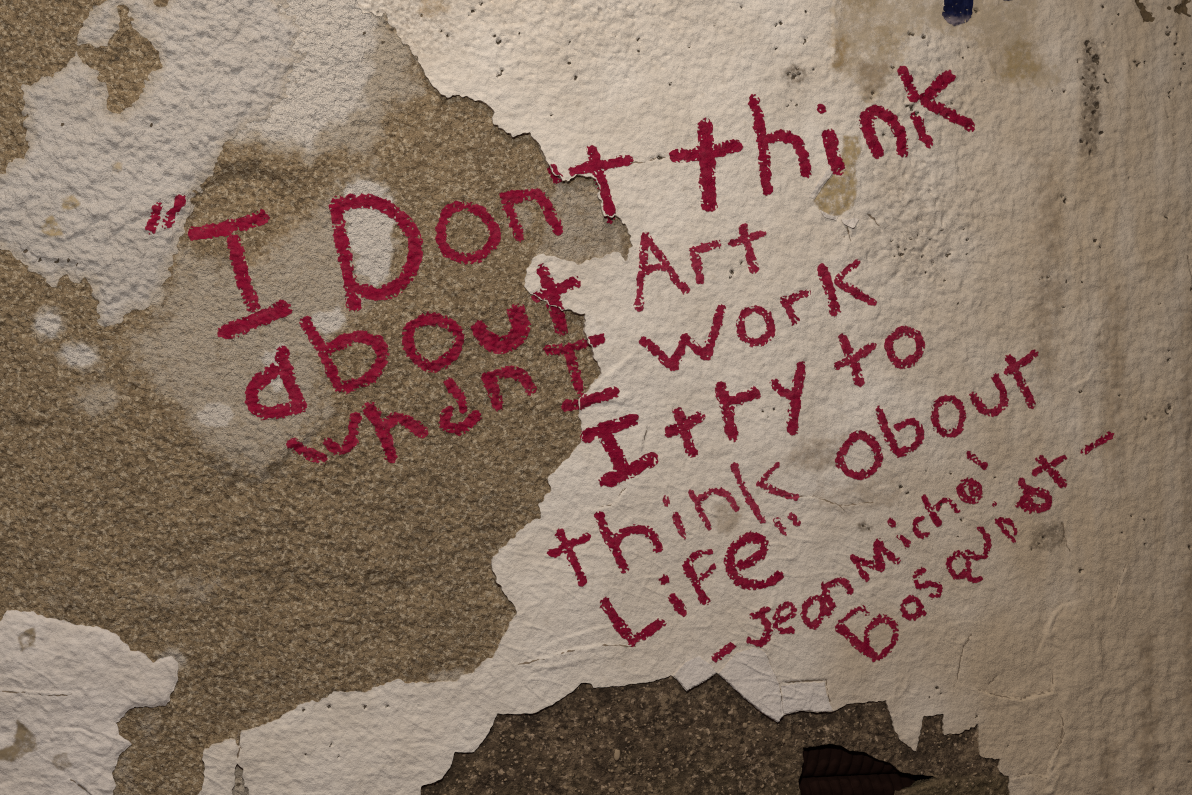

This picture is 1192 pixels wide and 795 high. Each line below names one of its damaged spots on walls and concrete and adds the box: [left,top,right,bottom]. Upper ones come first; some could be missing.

flaking render [1135,0,1155,22]
flaking render [1167,0,1191,17]
peeling [809,136,860,228]
flaking render [0,0,632,795]
flaking render [421,647,1009,795]